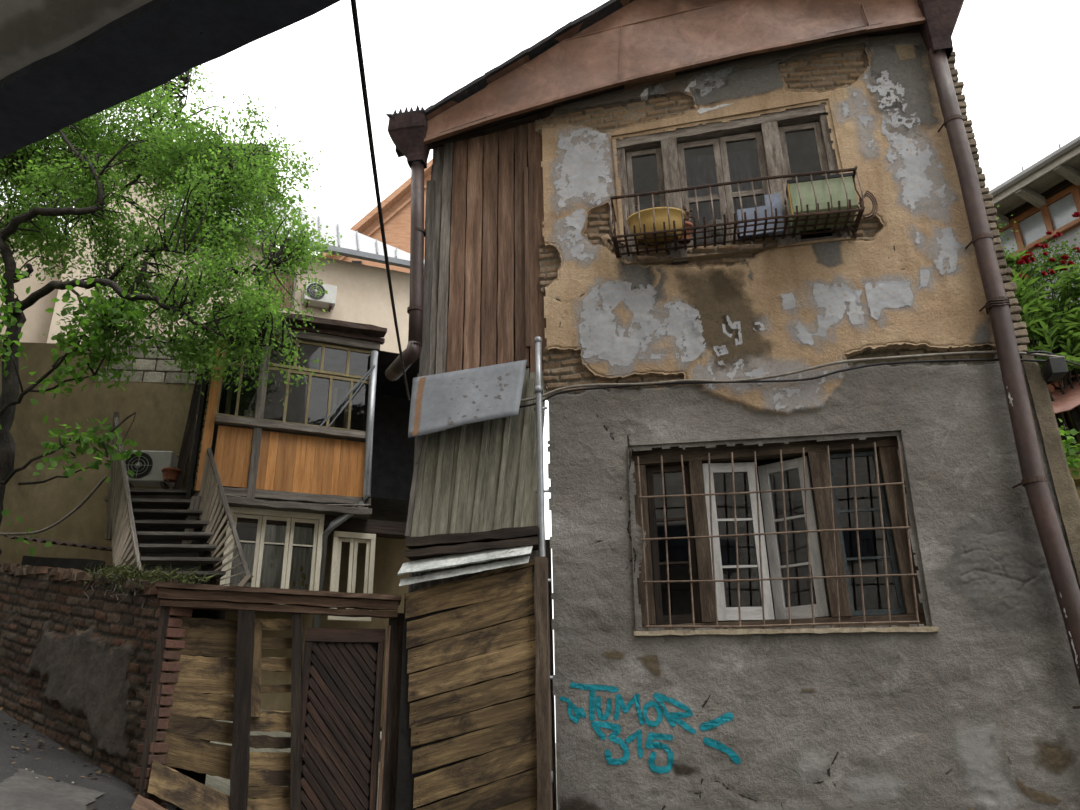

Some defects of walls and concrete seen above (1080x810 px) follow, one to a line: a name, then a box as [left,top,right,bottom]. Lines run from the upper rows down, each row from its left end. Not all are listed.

spalling [535,71,801,293]
spalling [778,43,956,213]
peeling [543,280,804,412]
peeling [795,227,962,346]